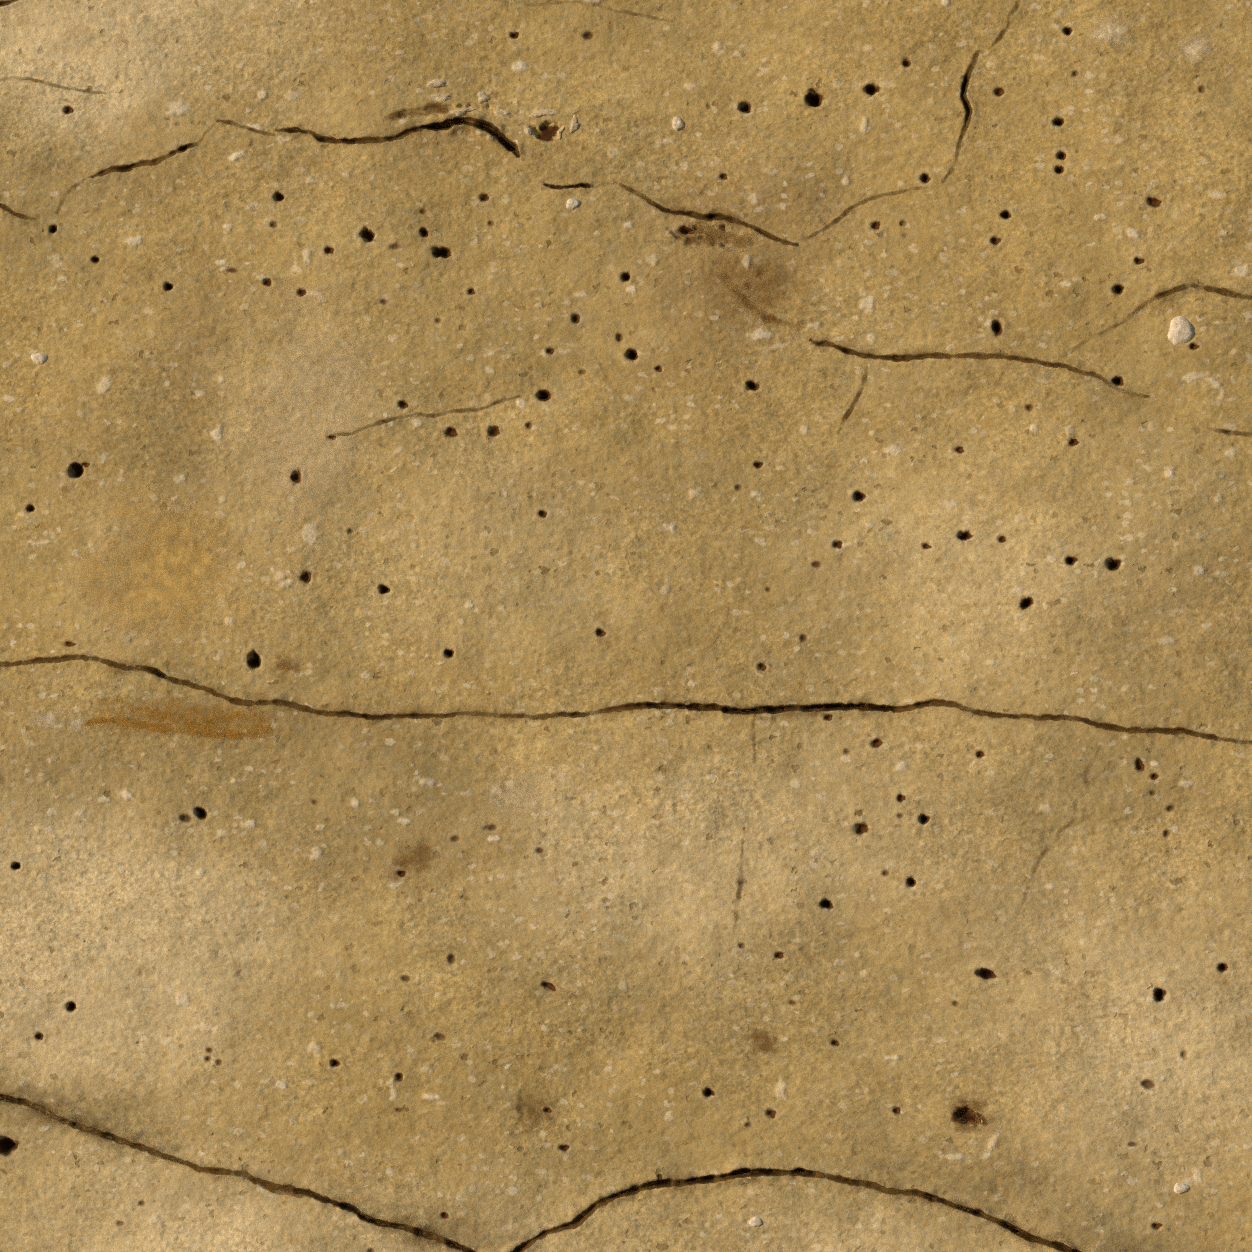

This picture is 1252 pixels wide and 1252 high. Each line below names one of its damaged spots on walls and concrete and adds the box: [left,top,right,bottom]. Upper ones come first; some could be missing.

crack [0,0,17,8]
crack [944,5,1018,179]
crack [91,117,520,178]
crack [543,182,593,190]
crack [626,188,895,246]
crack [1137,284,1252,310]
crack [809,339,1104,421]
crack [0,655,467,720]
corrosion [86,707,269,739]
crack [500,699,1252,744]
crack [0,1094,475,1252]
crack [513,1168,1080,1252]